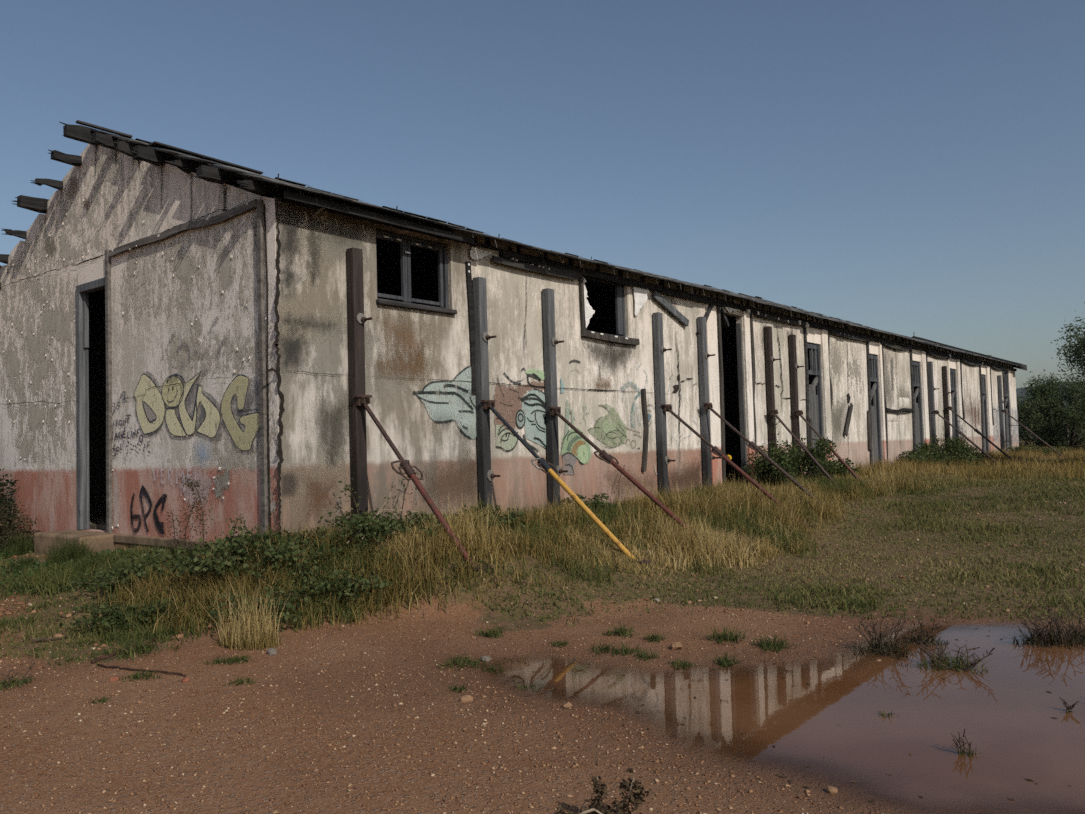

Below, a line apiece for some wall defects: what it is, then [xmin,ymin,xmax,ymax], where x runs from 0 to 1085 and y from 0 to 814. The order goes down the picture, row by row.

water stain [310,231,320,282]
peeling [0,152,278,513]
crack [151,193,341,531]
water stain [283,339,302,366]
crack [521,282,529,351]
crack [405,378,651,393]